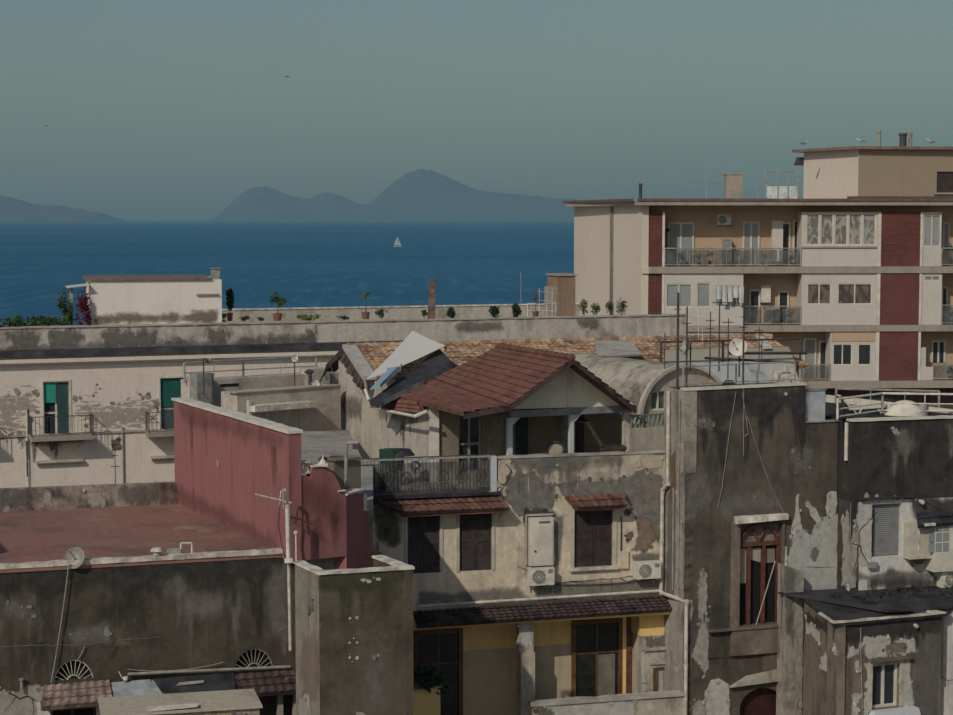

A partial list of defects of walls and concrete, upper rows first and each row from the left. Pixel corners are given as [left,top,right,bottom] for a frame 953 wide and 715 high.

water stain [0,310,317,350]
peeling [0,384,39,443]
spalling [495,459,665,556]
peeling [675,520,684,590]
peeling [785,491,919,715]
peeling [517,622,533,651]
peeling [683,568,730,715]
peeling [0,684,44,715]
peeling [543,651,647,715]